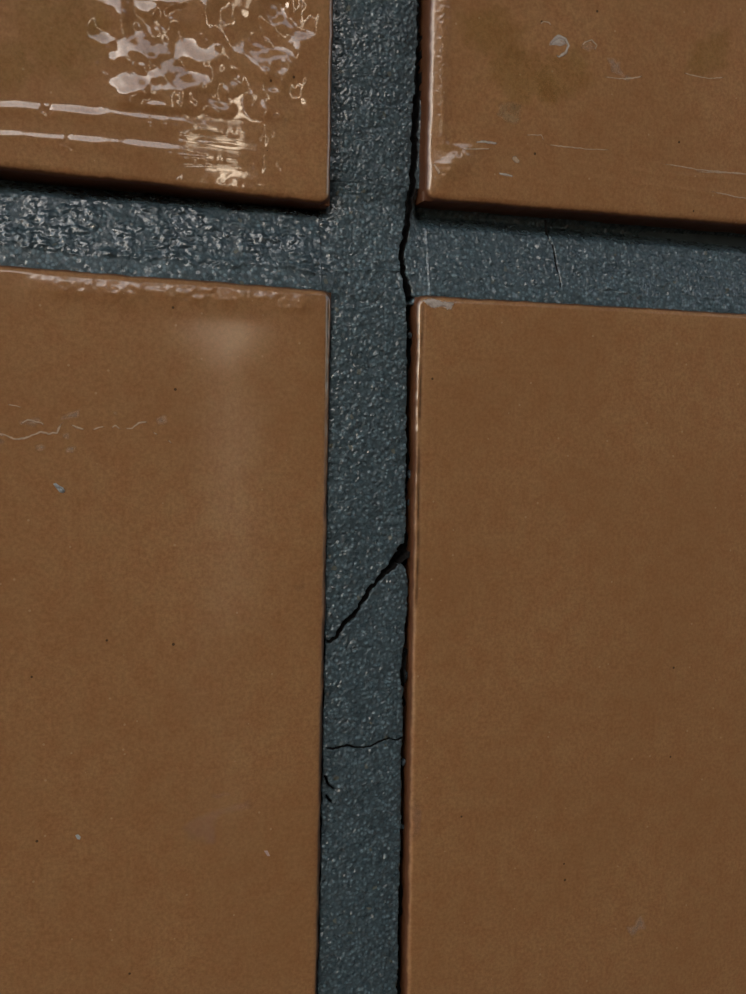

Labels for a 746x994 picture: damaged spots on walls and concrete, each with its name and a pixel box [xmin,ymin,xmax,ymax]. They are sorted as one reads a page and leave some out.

crack [398,0,422,386]
crack [403,444,411,497]
crack [324,531,410,656]
crack [320,647,408,841]
crack [315,873,323,972]
crack [395,850,403,994]